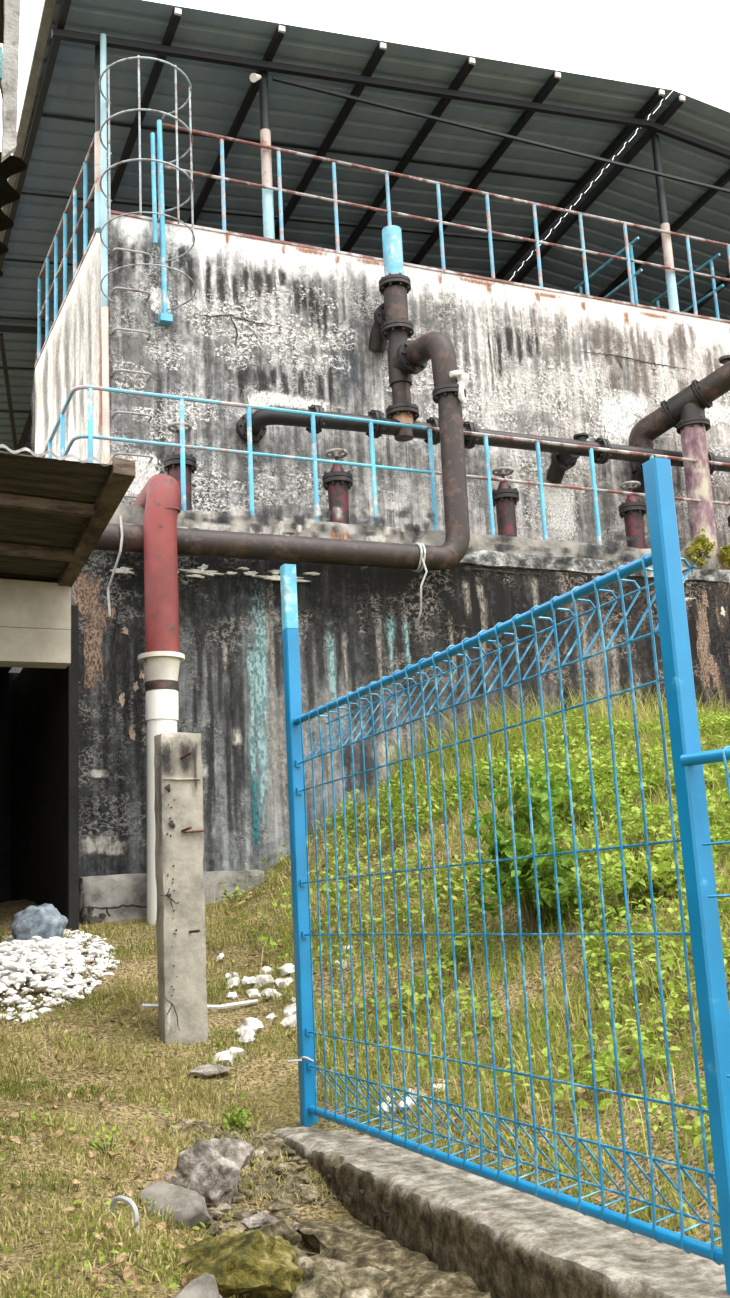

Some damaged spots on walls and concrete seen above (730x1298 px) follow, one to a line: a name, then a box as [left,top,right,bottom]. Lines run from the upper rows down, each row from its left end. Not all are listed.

leakage [118,243,149,272]
leakage [168,246,366,401]
leakage [412,300,719,431]
leakage [204,435,244,480]
leakage [276,451,318,491]
leakage [358,453,396,493]
leakage [585,482,612,523]
leakage [101,634,143,783]
leakage [158,616,287,845]
leakage [304,579,415,794]
leakage [451,569,658,717]
leakage [698,582,730,708]